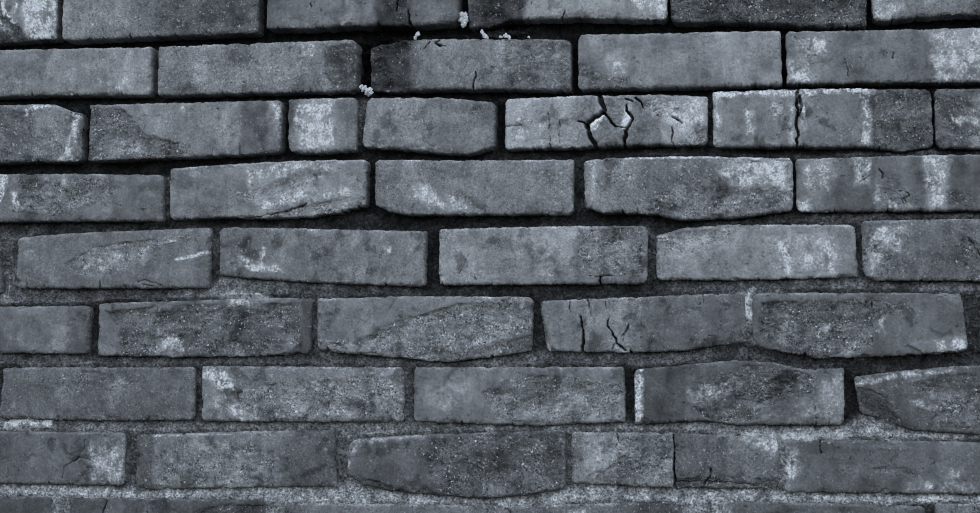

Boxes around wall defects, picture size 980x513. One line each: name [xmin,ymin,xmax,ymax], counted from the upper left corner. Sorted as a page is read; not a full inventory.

crack [396,0,446,49]
crack [547,96,644,149]
crack [568,274,629,352]
crack [61,439,94,479]